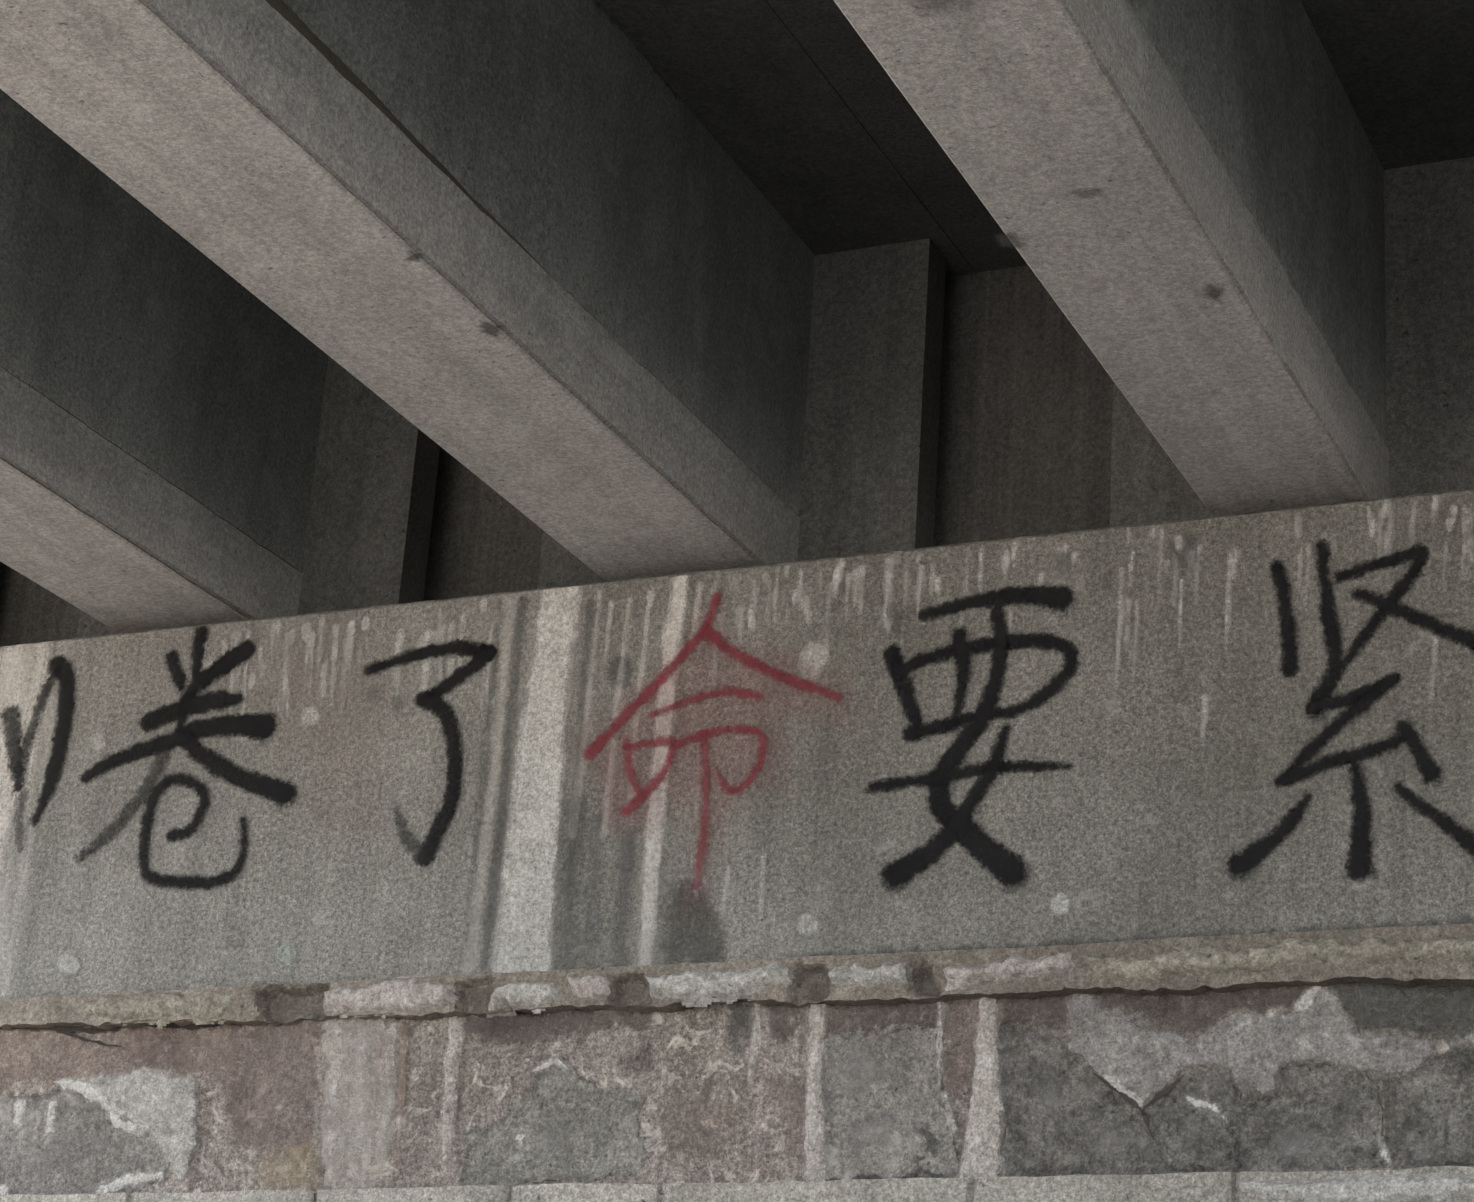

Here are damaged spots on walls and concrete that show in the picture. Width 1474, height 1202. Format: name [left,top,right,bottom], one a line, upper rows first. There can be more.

water stain [0,642,48,834]
water stain [496,586,581,973]
water stain [618,575,687,919]
water stain [660,883,724,962]
spalling [0,1070,197,1196]
spalling [997,986,1474,1177]